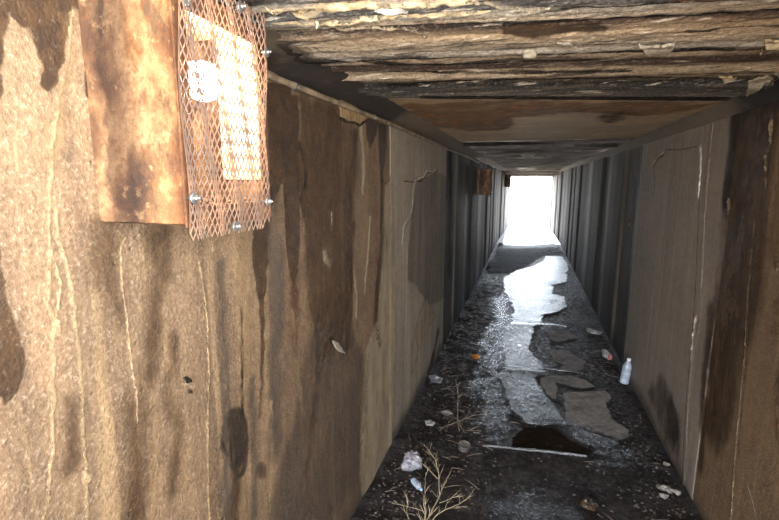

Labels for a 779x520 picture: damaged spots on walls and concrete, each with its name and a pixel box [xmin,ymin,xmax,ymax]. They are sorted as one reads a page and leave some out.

peeling [523,49,537,59]
peeling [639,43,676,56]
peeling [745,72,779,96]
peeling [759,38,779,56]
damp [0,0,81,518]
damp [95,224,144,520]
damp [147,231,169,383]
damp [196,251,210,396]
damp [221,82,396,520]
damp [699,101,779,473]
damp [66,390,90,518]
damp [171,440,180,494]